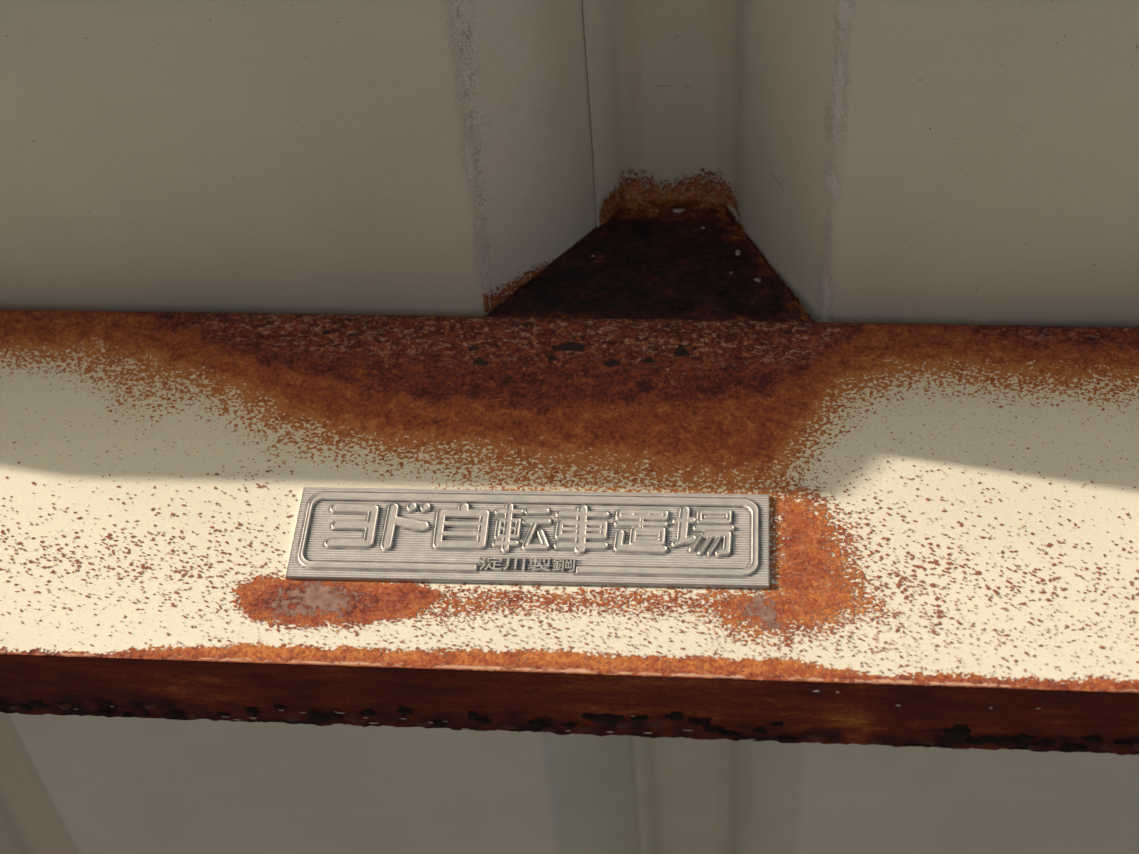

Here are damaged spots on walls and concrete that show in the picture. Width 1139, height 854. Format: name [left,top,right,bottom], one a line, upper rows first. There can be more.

corrosion [598,168,741,226]
corrosion [0,259,1139,693]
corrosion [93,702,157,717]
corrosion [217,704,378,726]
corrosion [396,705,449,728]
corrosion [464,710,824,741]
corrosion [920,724,1139,751]